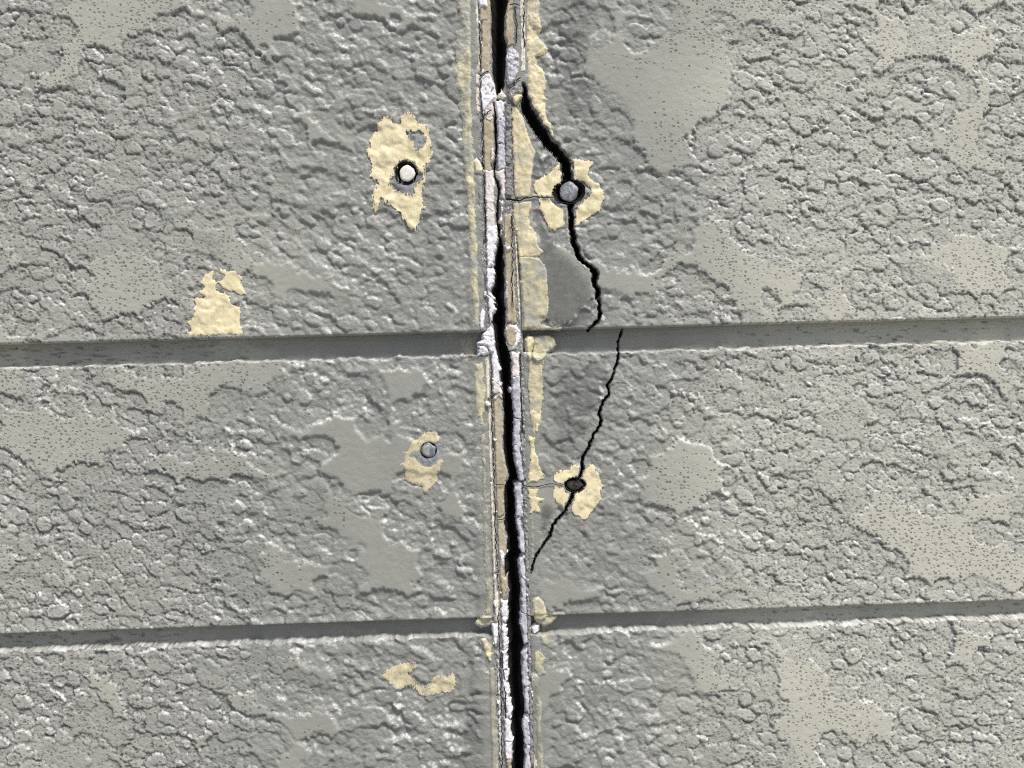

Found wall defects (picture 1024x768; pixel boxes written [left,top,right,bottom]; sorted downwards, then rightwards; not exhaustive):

peeling [476,32,540,768]
damp [533,152,552,175]
crack [478,0,623,768]
damp [534,215,590,327]